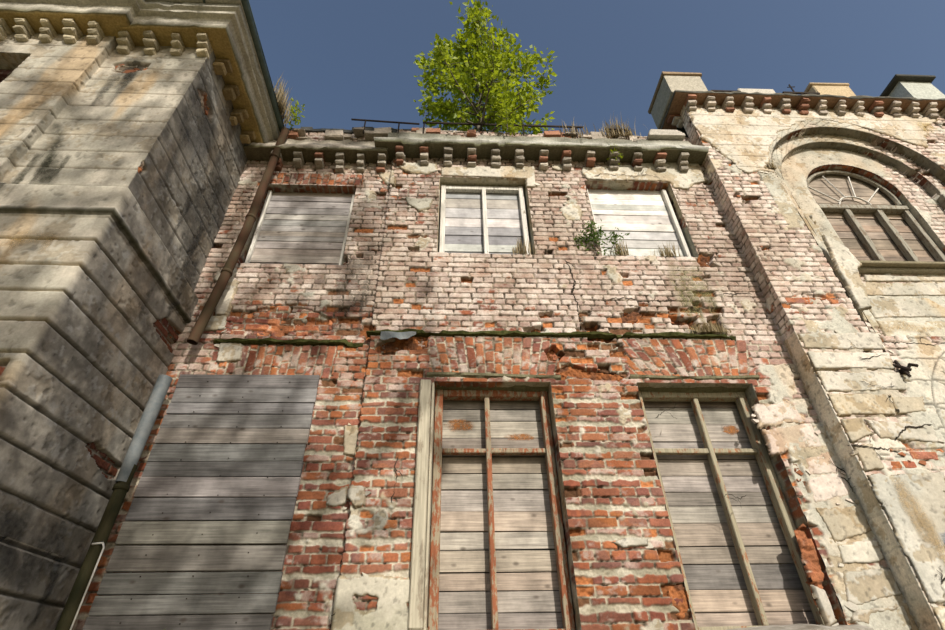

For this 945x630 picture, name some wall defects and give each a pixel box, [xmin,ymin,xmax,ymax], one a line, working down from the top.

water stain [4,137,68,184]
crack [566,261,586,331]
spalling [785,295,839,305]
spalling [546,349,623,382]
flaking render [797,214,945,630]
flaking render [750,399,920,630]